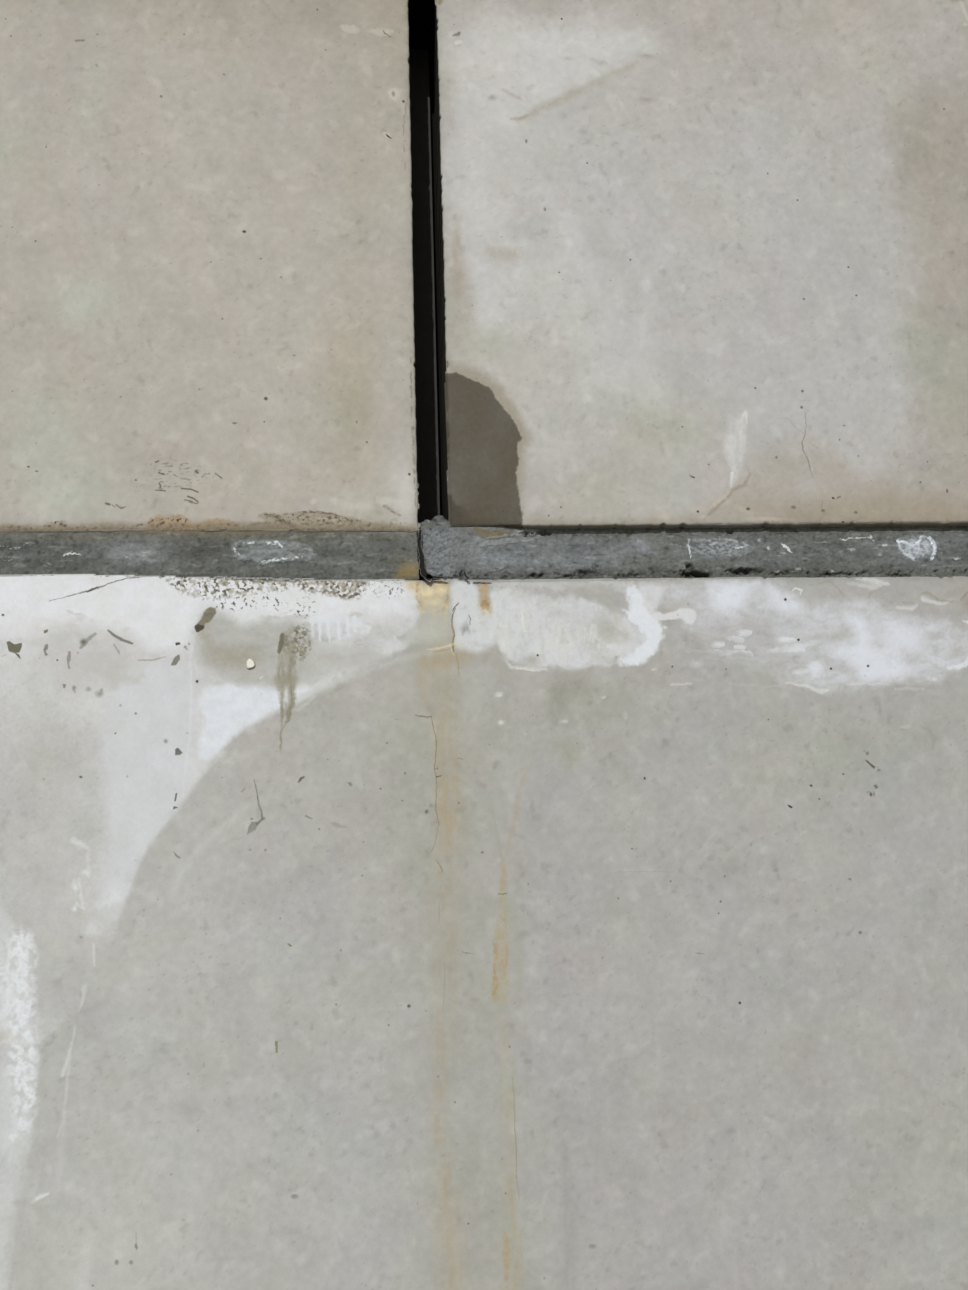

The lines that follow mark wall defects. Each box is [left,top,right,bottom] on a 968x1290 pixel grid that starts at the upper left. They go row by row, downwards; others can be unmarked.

corrosion [391,560,451,646]
corrosion [477,580,494,612]
water stain [0,409,968,1290]